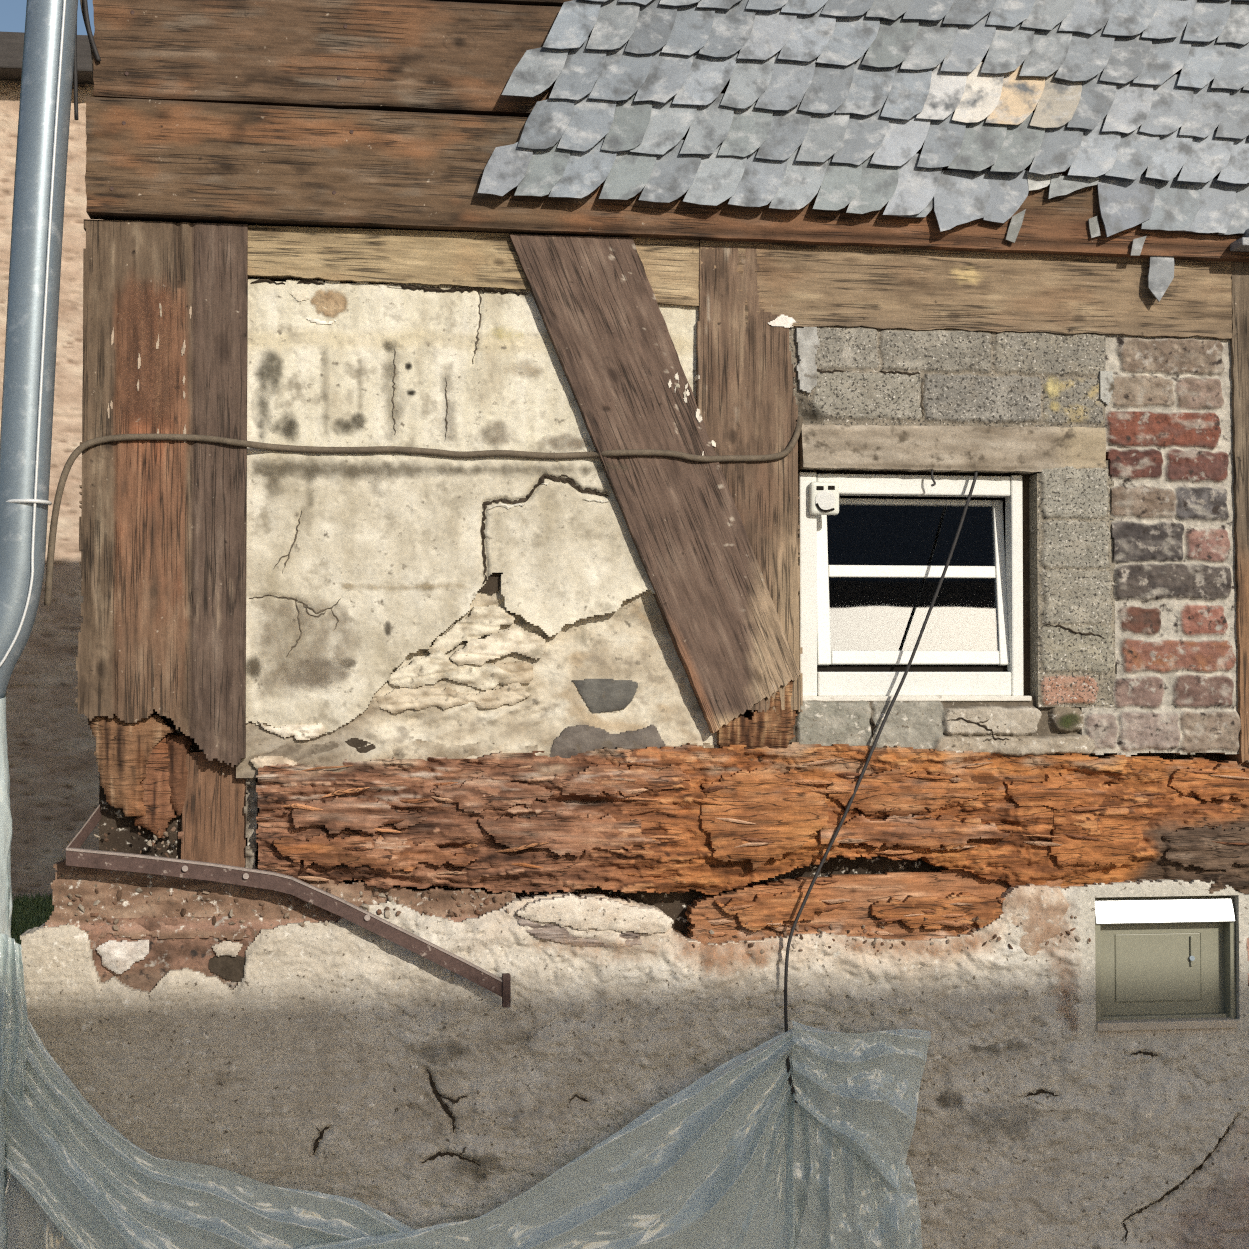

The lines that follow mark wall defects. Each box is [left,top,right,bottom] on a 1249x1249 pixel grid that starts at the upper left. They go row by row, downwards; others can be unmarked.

crack [251,278,324,286]
crack [390,282,528,361]
crack [389,346,397,433]
crack [442,378,450,440]
crack [480,474,609,584]
crack [251,510,340,657]
spalling [236,573,717,778]
spalling [89,916,255,992]
crack [314,1127,329,1154]
crack [421,1070,479,1165]
crack [1123,1115,1238,1242]